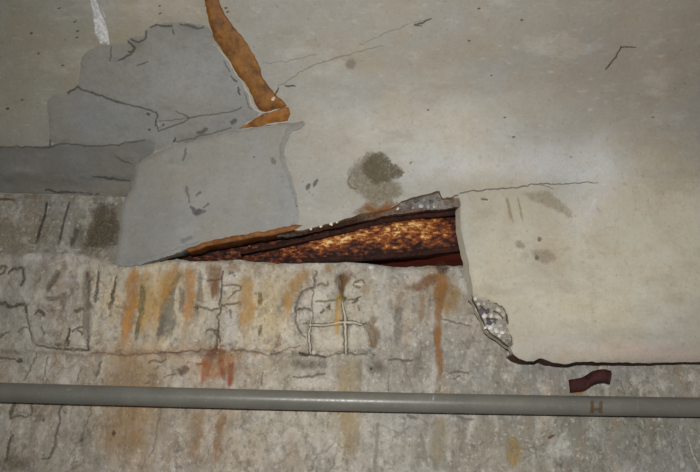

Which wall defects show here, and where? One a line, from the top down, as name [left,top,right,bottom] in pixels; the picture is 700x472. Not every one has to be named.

rust [205,0,290,129]
spalling [185,186,210,215]
rust [186,224,303,257]
spalling [276,193,460,239]
leakage [347,152,403,202]
rust [302,245,460,263]
crack [446,181,598,198]
crack [0,271,117,381]
crack [194,271,241,350]
crack [238,270,367,379]
rust [413,264,447,370]
spalling [472,295,513,348]